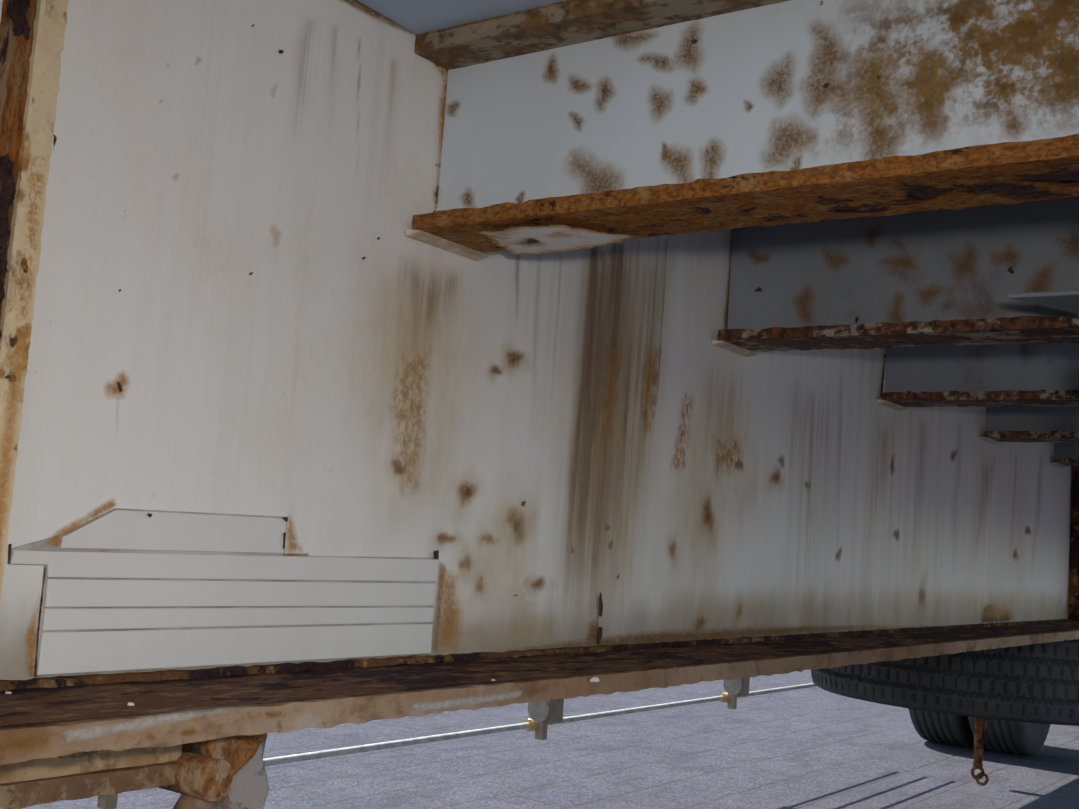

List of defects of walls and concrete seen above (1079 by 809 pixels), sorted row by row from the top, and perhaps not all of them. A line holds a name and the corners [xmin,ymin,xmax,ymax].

rust [642,28,697,69]
rust [652,92,669,114]
rust [688,81,705,101]
rust [767,61,790,99]
rust [807,0,1079,159]
rust [572,158,618,193]
rust [662,144,688,183]
rust [704,144,720,179]
rust [769,124,806,171]
rust [394,359,425,482]
rust [0,365,20,542]